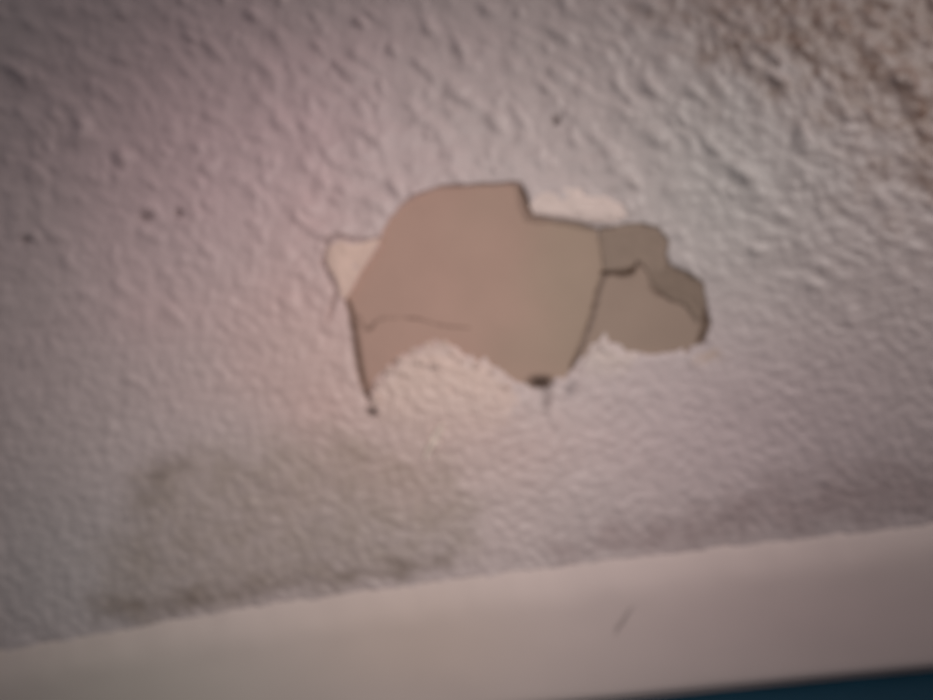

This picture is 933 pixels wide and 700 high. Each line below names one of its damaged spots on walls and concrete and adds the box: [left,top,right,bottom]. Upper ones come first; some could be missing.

peeling [326,183,710,452]